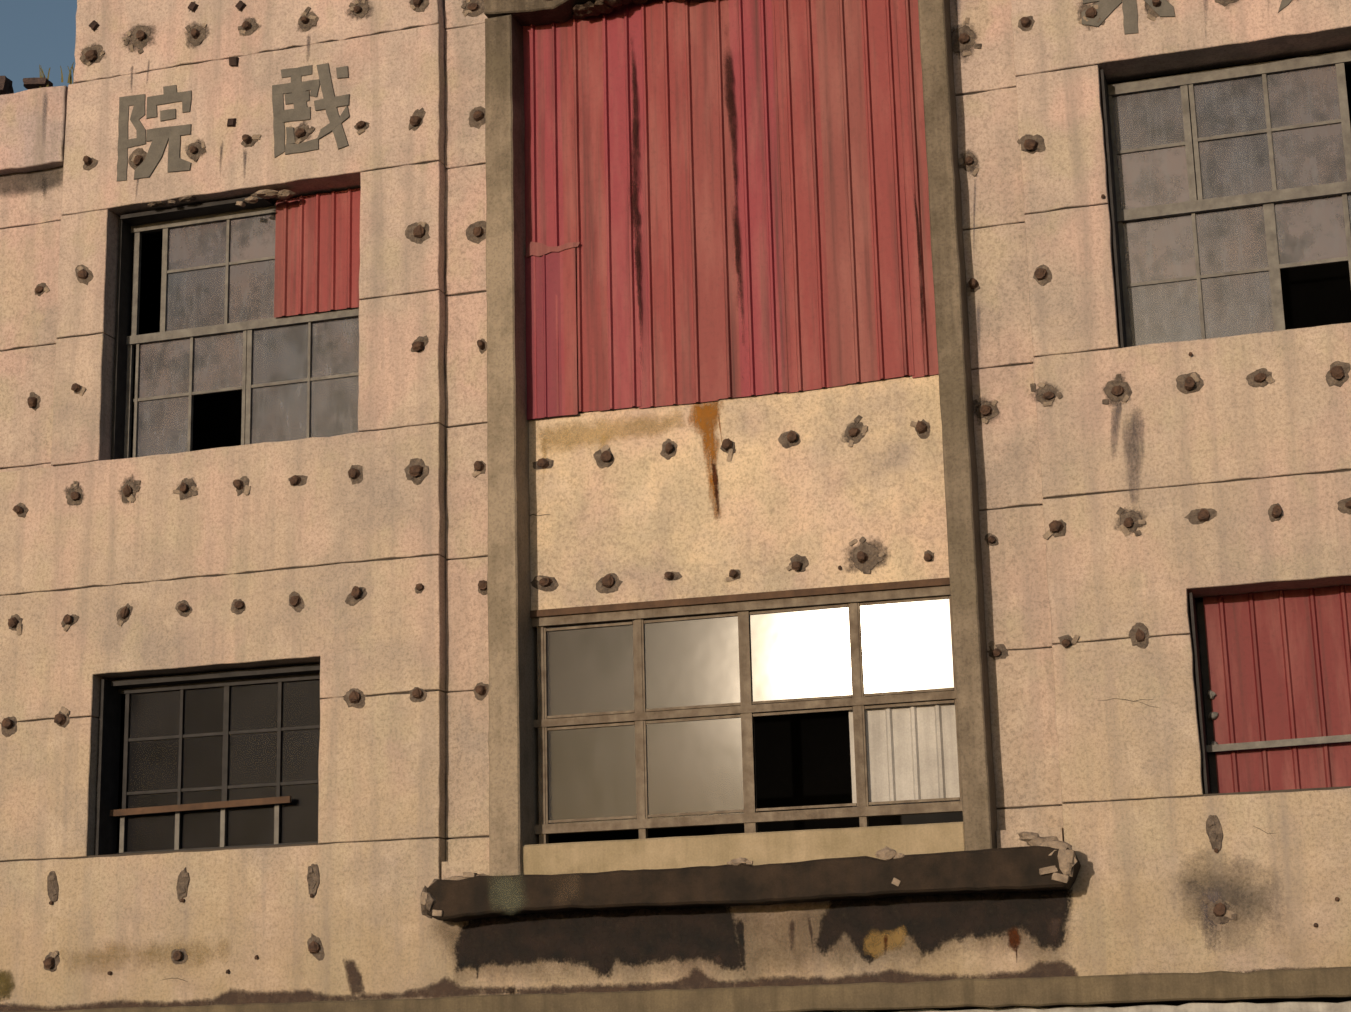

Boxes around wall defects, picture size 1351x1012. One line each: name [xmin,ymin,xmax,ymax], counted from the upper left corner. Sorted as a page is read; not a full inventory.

spalling [571,0,653,19]
rust [690,401,721,514]
spalling [1018,832,1077,883]
leakage [0,889,1077,1012]